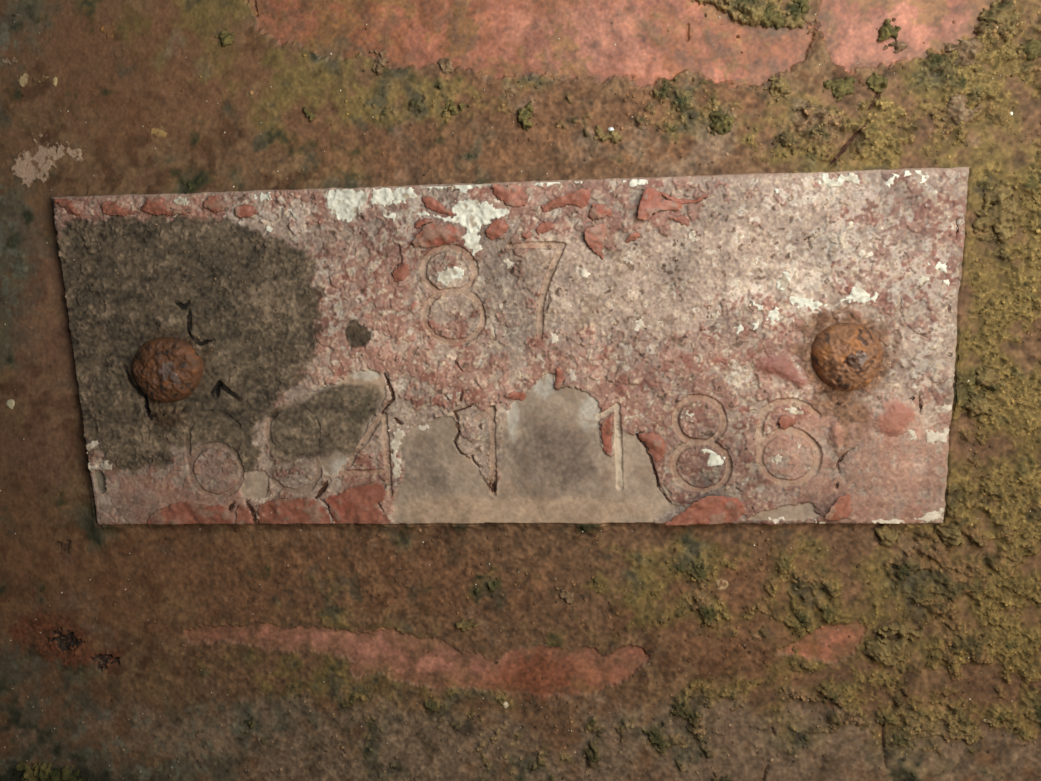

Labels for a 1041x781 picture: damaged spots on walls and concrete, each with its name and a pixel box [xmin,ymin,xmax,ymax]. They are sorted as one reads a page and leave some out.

peeling [242,0,1003,91]
peeling [326,182,613,260]
peeling [623,179,708,243]
peeling [392,263,410,282]
corrosion [795,311,890,443]
peeling [147,367,852,526]
peeling [871,508,944,524]